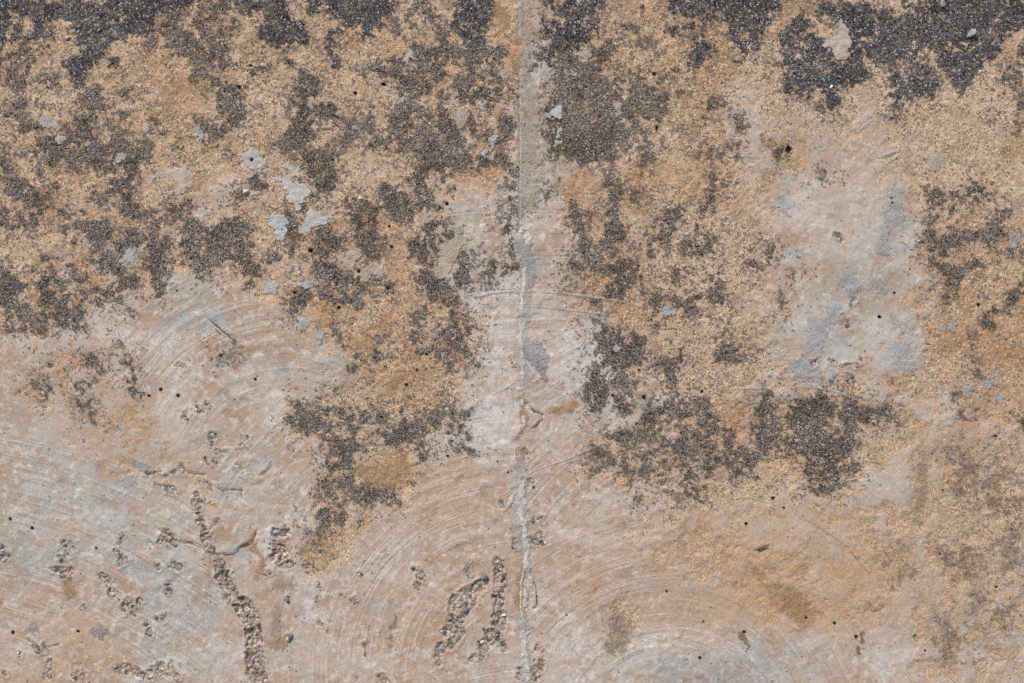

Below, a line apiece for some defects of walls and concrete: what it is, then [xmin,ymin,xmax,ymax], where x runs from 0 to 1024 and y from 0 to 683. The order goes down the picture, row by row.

spalling [190,478,268,683]
spalling [435,557,508,666]